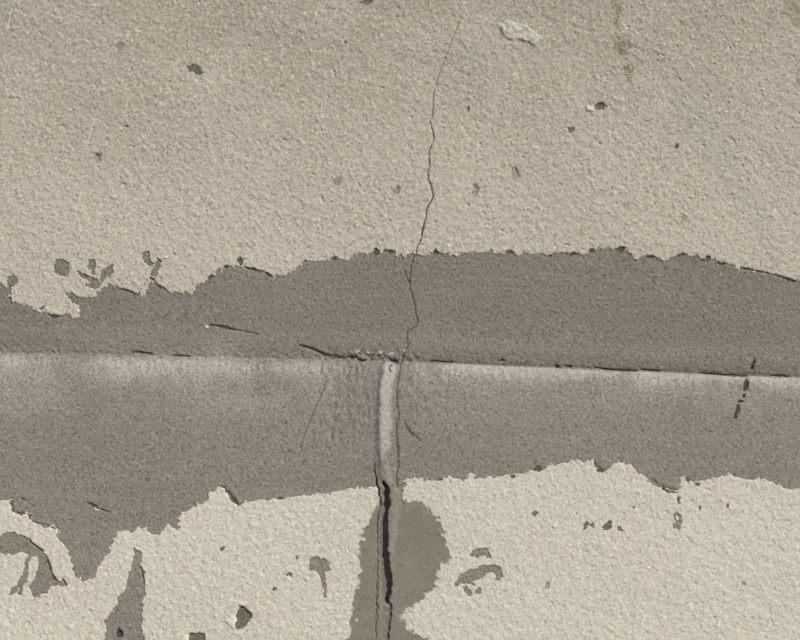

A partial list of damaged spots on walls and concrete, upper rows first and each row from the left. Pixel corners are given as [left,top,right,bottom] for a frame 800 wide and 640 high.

crack [299,23,459,640]
peeling [0,246,800,582]
crack [595,365,658,373]
crack [702,360,755,419]
peeling [0,532,67,598]
peeling [103,548,146,640]
spalling [181,631,205,640]
spalling [224,605,252,629]
peeling [309,557,330,598]
damp [346,499,452,640]
peeling [454,548,503,596]